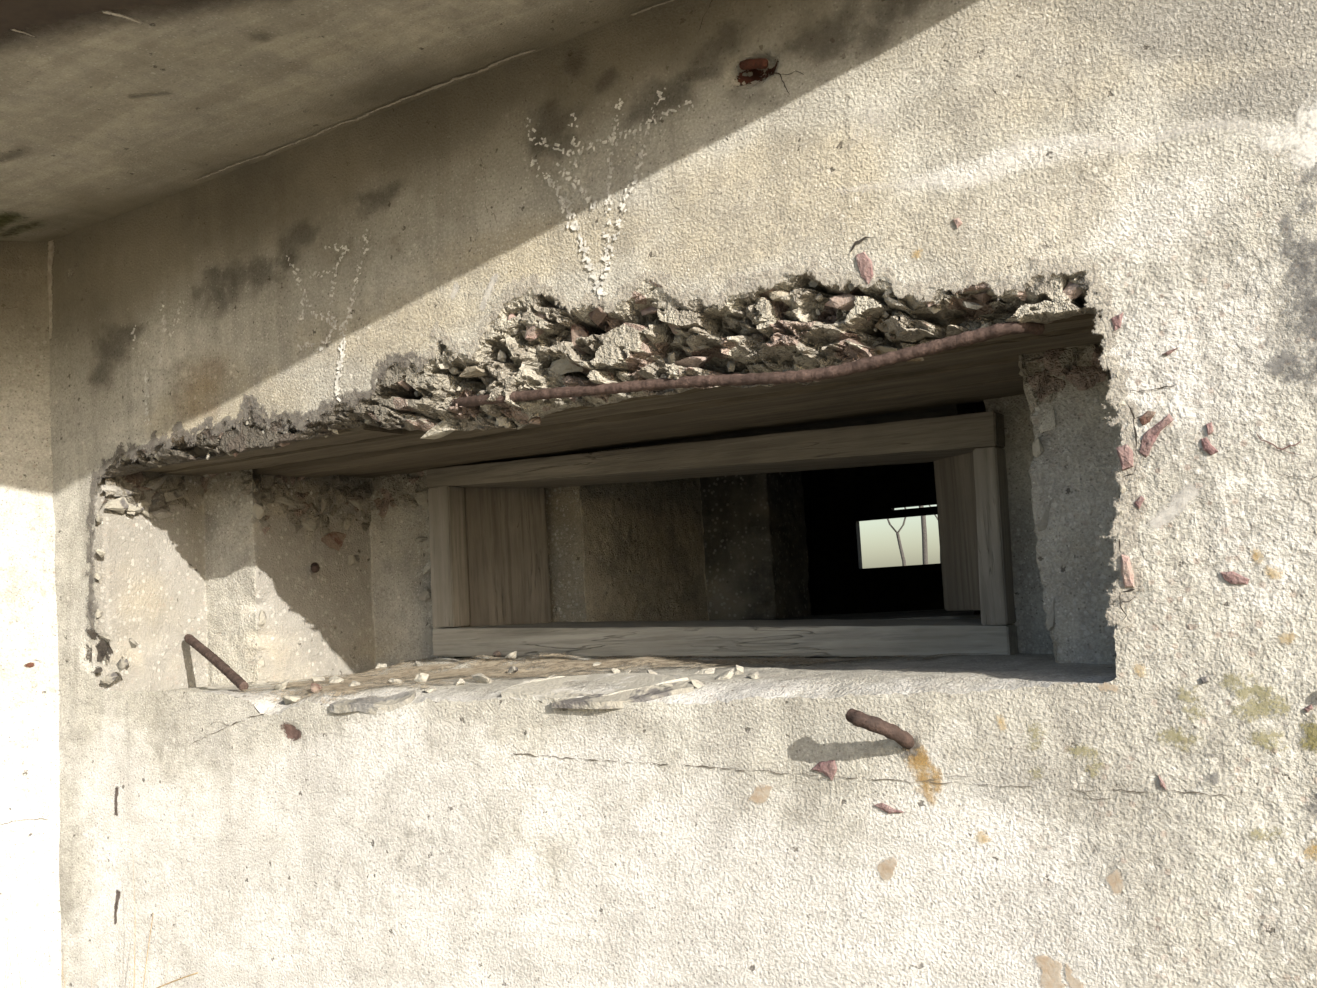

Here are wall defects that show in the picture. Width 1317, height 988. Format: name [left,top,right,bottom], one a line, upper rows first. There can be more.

spalling [84,250,1173,685]
corrosion [184,634,249,691]
crack [513,753,1226,800]
corrosion [900,736,940,802]